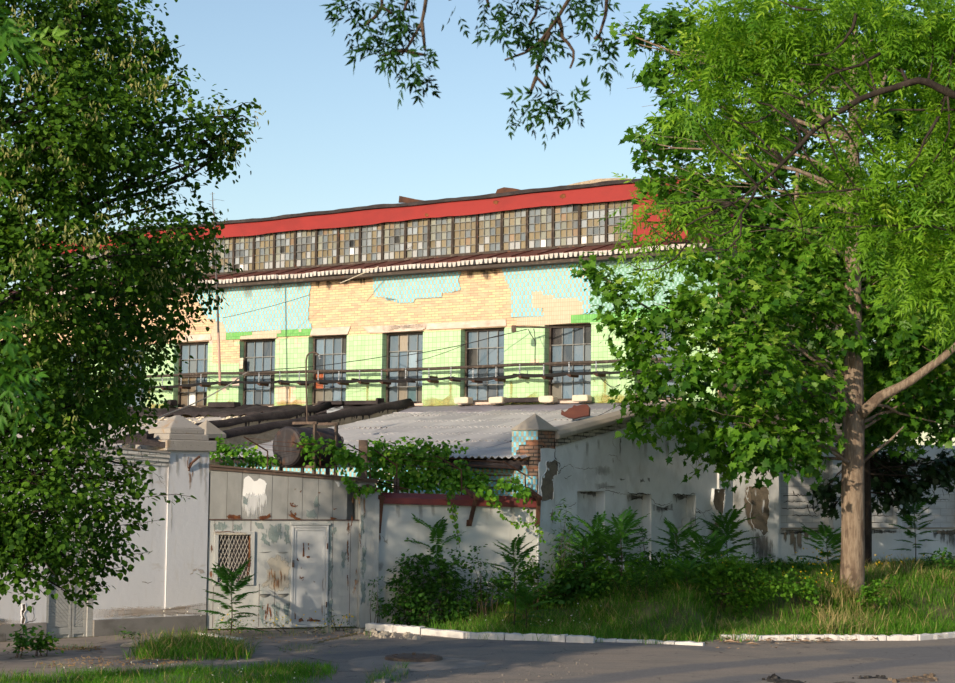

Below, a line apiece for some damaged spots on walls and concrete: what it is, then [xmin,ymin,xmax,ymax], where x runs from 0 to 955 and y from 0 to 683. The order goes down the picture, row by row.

spalling [517,292,583,326]
corrosion [561,404,591,419]
spalling [540,458,560,524]
spalling [710,488,726,520]
spalling [746,485,770,536]
water stain [744,487,772,562]
water stain [783,529,825,552]